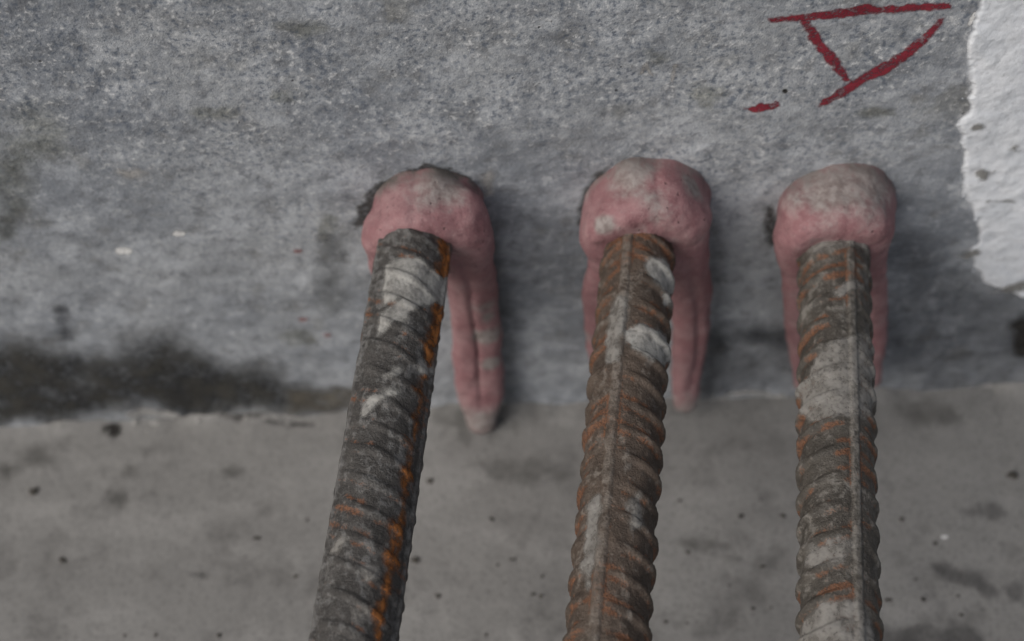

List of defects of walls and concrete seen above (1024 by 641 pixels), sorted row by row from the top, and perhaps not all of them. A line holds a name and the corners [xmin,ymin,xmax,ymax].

water stain [0,345,352,423]